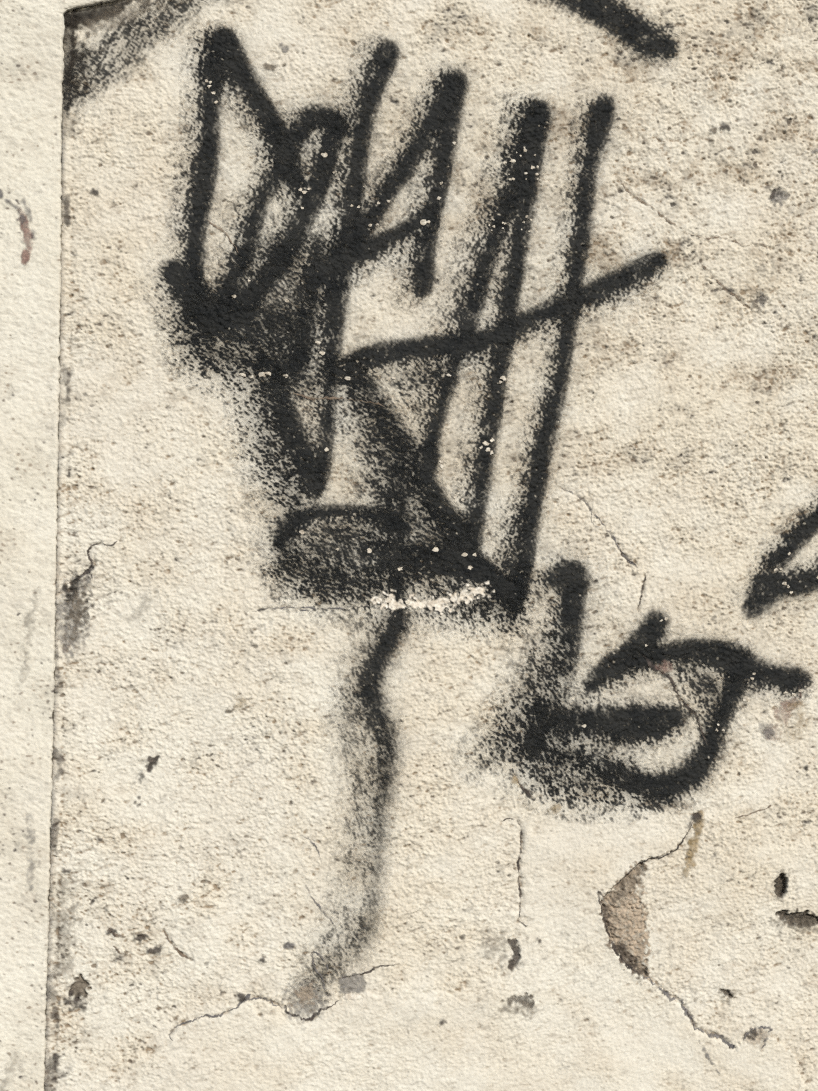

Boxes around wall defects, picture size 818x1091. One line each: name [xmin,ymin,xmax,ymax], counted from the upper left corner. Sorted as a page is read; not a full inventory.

spalling [776,909,818,932]
spalling [598,816,773,1073]
crack [169,994,285,1040]